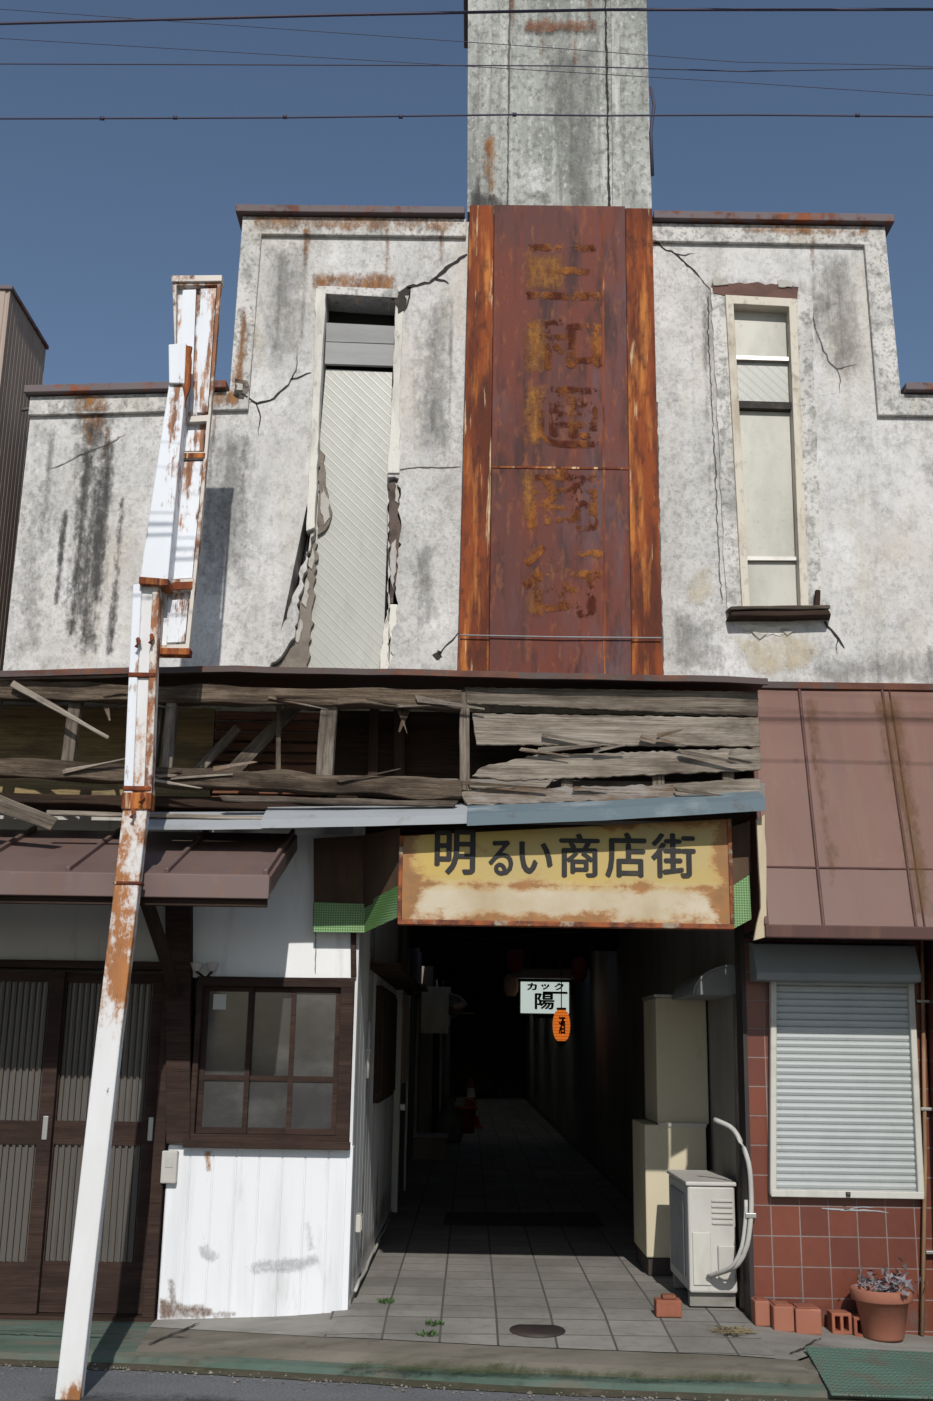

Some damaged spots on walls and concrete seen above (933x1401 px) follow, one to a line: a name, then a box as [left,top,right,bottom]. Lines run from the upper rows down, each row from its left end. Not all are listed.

corrosion [510,0,596,33]
corrosion [255,216,446,255]
corrosion [313,274,393,289]
crack [388,254,467,311]
crack [813,314,856,392]
corrosion [81,395,110,455]
crack [241,354,311,435]
damp [55,414,124,653]
spalling [275,450,332,667]
spalling [387,481,401,604]